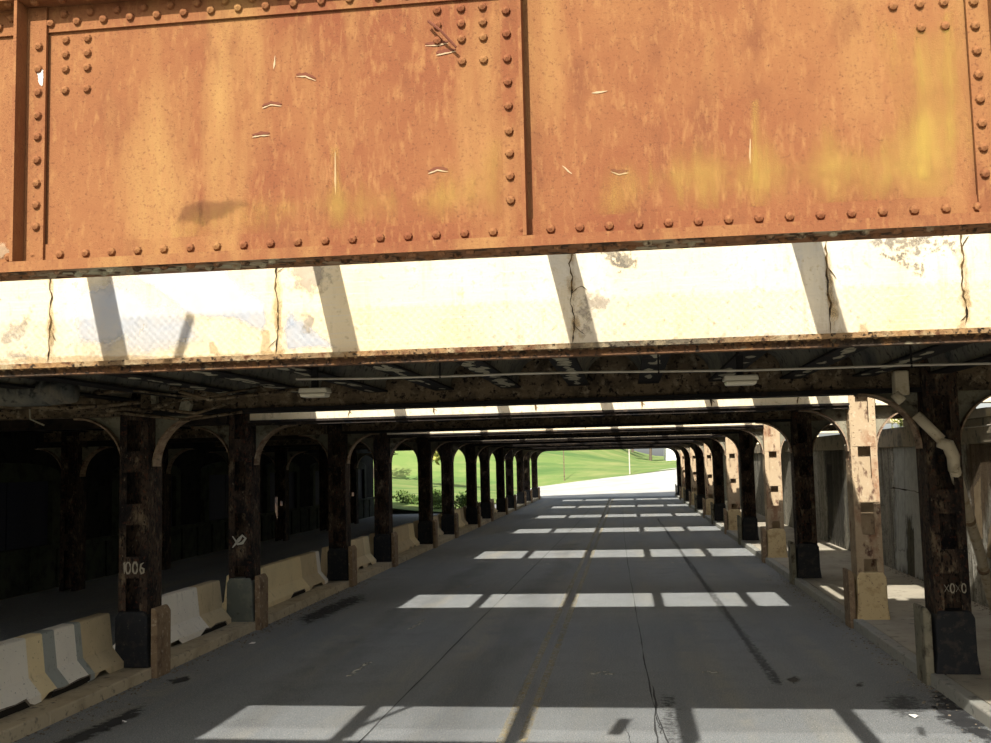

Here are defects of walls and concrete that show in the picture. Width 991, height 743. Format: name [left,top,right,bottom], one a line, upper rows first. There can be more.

crack [47,279,56,358]
crack [270,268,283,351]
crack [568,254,587,343]
crack [824,241,836,333]
crack [960,235,969,325]
peeling [192,371,298,392]
peeling [461,361,515,387]
peeling [552,358,581,384]
crack [623,517,669,743]